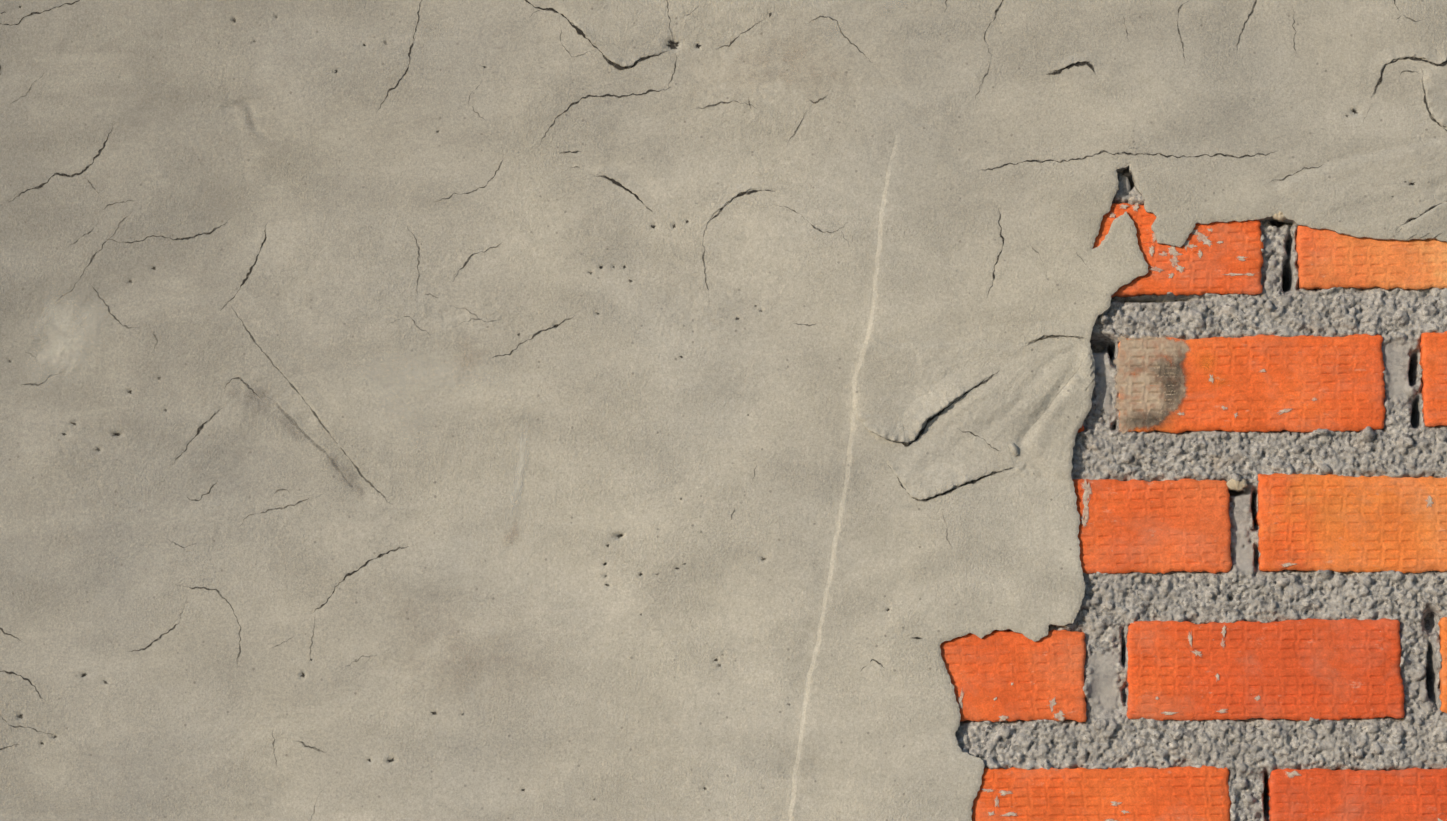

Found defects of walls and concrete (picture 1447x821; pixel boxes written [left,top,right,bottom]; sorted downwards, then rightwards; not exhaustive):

crack [380,5,420,108]
crack [545,2,689,168]
spalling [1110,169,1139,218]
crack [986,150,1320,181]
crack [12,127,222,328]
crack [223,226,266,308]
crack [988,212,1004,294]
peeling [1149,227,1223,278]
peeling [1081,480,1091,526]
crack [314,547,402,612]
peeling [1047,698,1065,721]
peeling [981,789,1017,816]